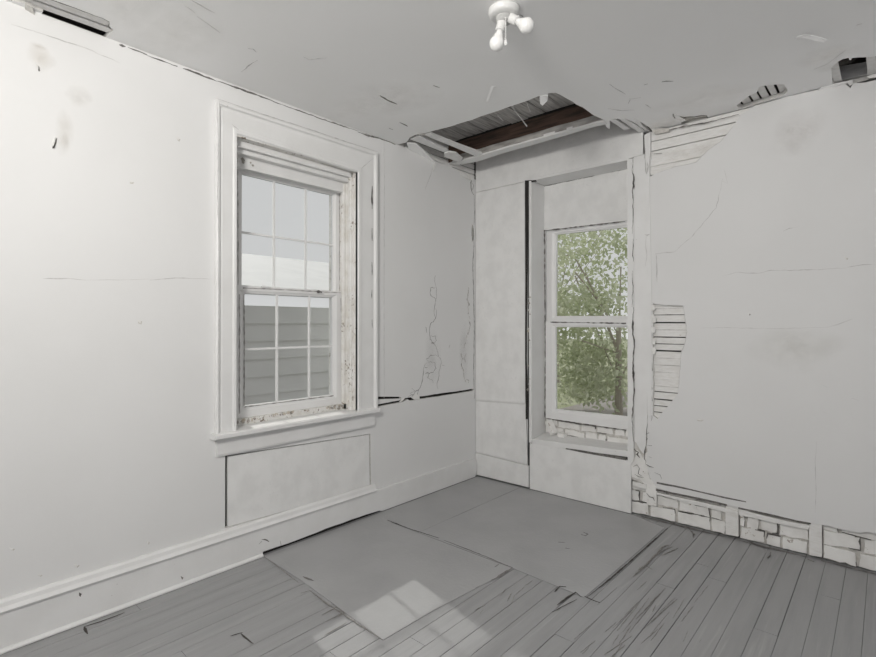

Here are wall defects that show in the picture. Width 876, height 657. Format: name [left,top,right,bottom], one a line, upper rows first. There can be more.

crack [15,25,407,219]
flaking render [398,134,474,186]
flaking render [651,107,752,175]
crack [132,278,219,355]
crack [378,275,475,406]
crack [525,180,537,419]
flaking render [651,304,687,420]
flaking render [545,416,628,444]
crack [553,148,875,657]
flaking render [632,479,726,535]
flaking render [740,516,809,554]
flaking render [823,525,876,571]